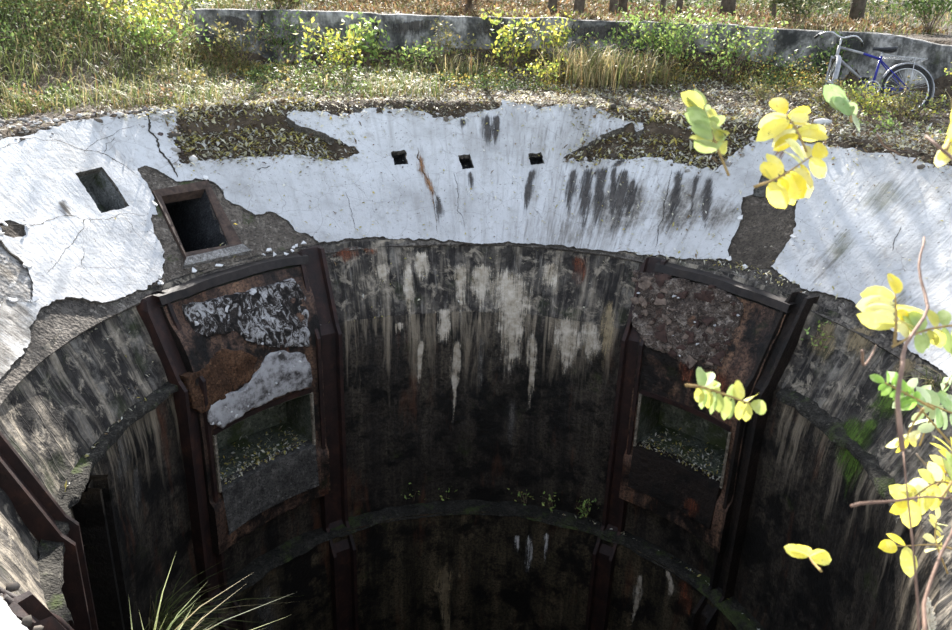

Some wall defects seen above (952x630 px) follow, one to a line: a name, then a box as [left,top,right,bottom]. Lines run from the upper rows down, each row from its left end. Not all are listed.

spalling [0,221,39,306]
crack [0,207,155,276]
crack [2,115,178,177]
spalling [11,106,260,167]
spalling [138,166,318,287]
water stain [395,251,429,331]
rust [419,156,434,201]
water stain [565,159,637,228]
water stain [666,171,712,231]
spalling [726,196,798,269]
water stain [437,264,537,409]
rust [179,349,258,413]